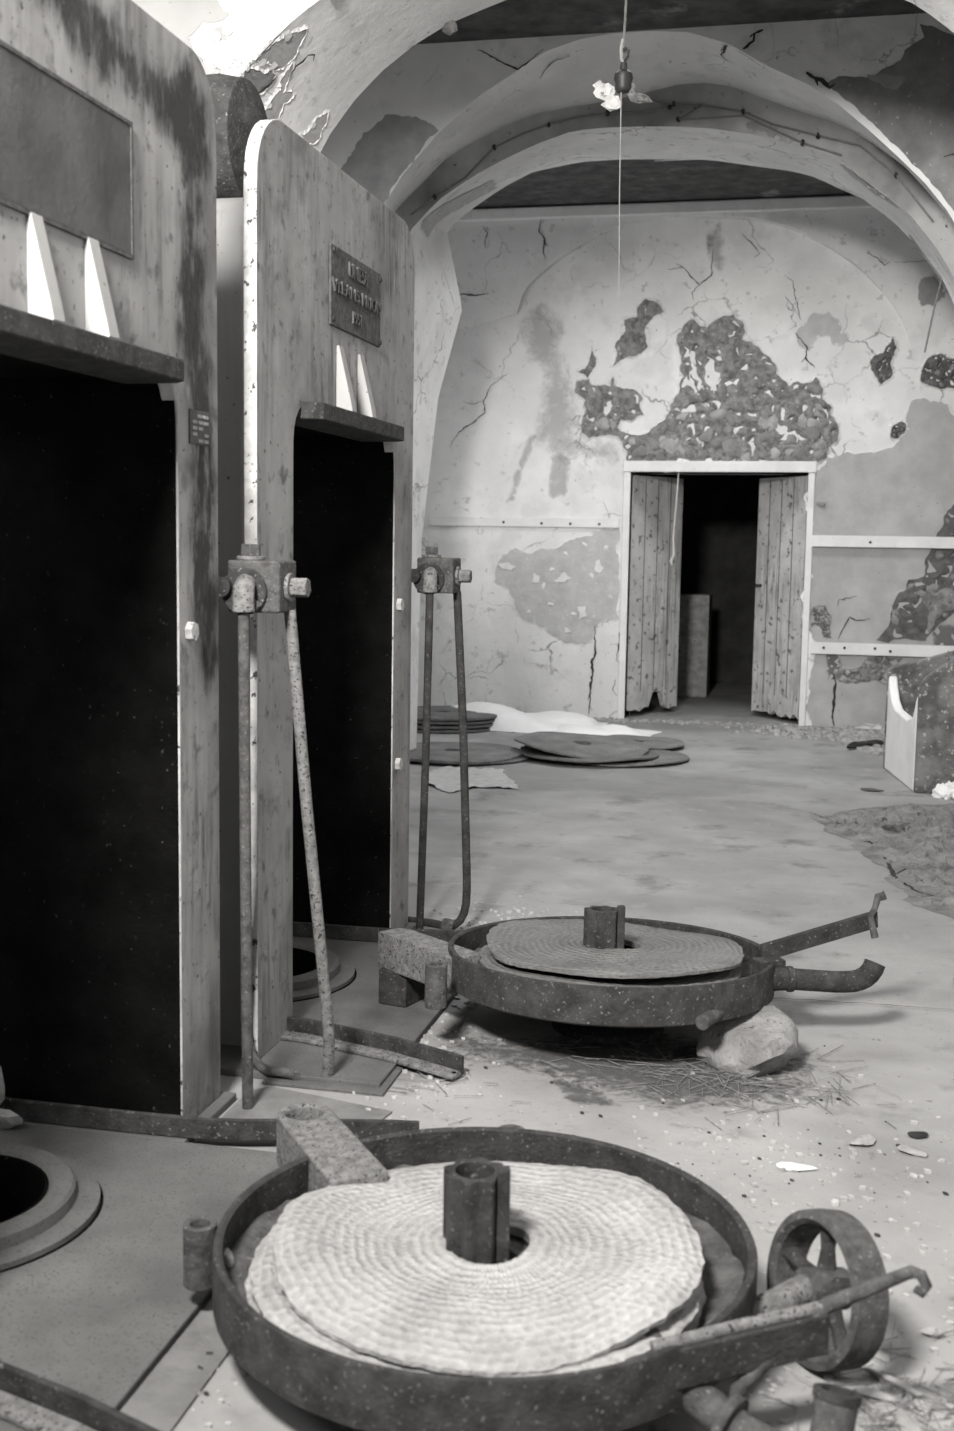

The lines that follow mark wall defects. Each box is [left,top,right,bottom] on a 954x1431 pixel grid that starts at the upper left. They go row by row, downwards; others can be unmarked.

flaking render [132,0,309,120]
flaking render [299,109,331,147]
flaking render [341,114,439,204]
crack [668,254,713,300]
crack [742,234,815,367]
crack [451,375,506,445]
peeling [574,296,954,730]